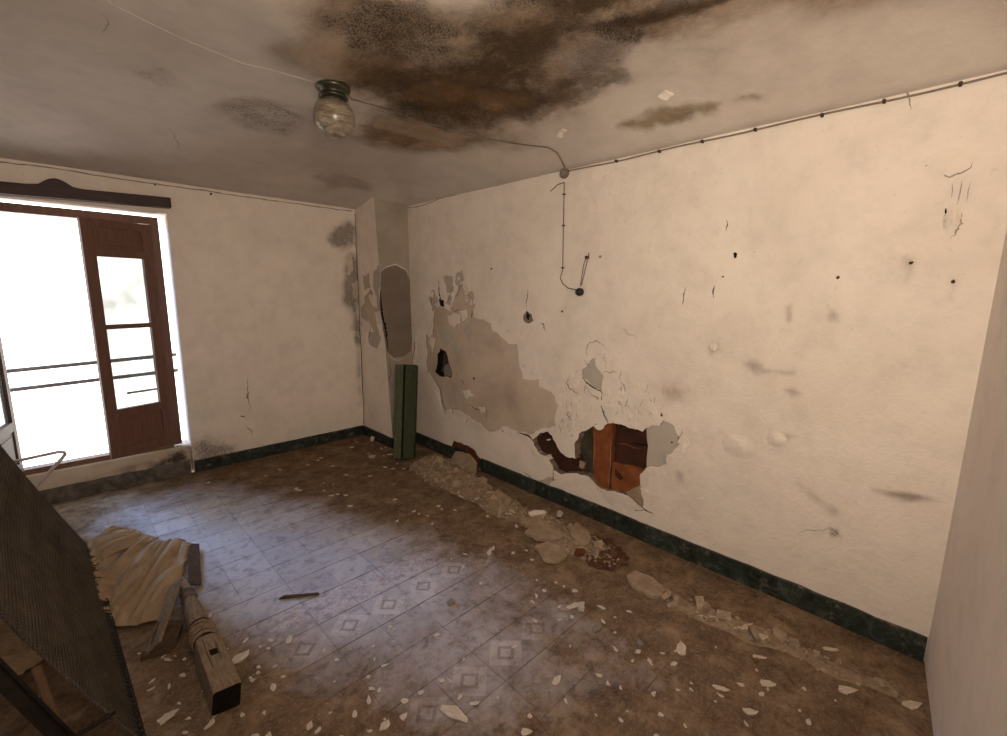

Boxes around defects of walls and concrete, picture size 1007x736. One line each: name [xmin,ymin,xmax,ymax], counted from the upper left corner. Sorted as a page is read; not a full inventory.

water stain [283,0,838,151]
peeling [361,265,381,349]
peeling [425,270,680,514]